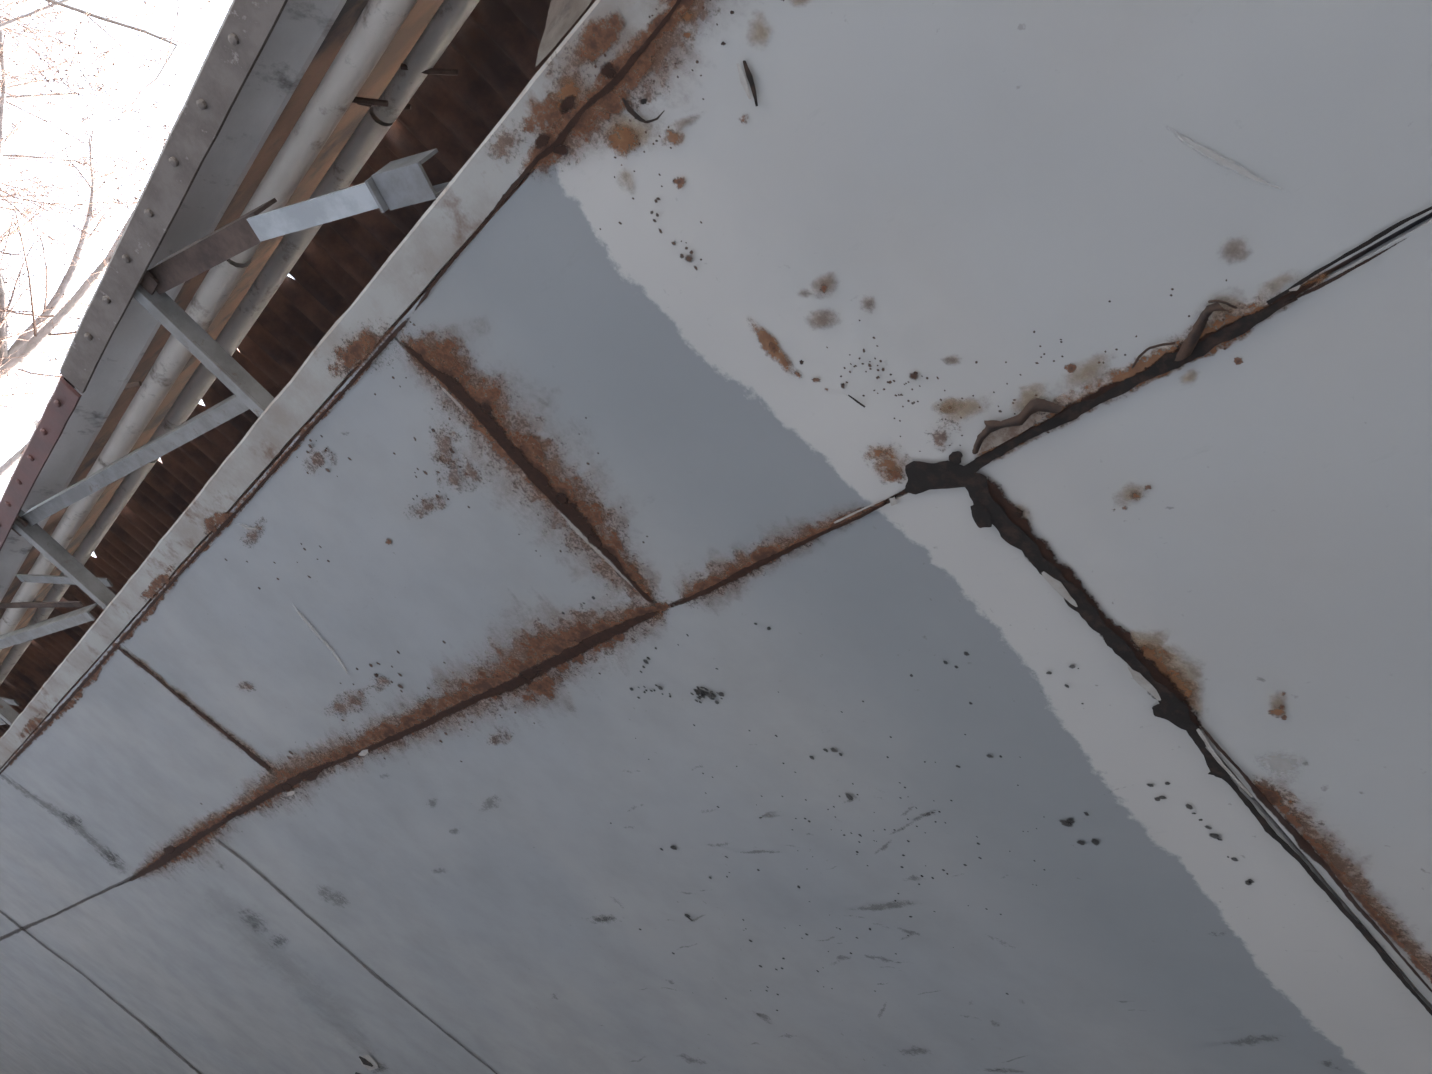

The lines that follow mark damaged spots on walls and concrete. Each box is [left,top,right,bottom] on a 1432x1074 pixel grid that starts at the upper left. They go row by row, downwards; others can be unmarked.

rust [0,0,981,881]
rust [976,273,1327,460]
rust [1131,636,1198,709]
crack [947,206,1432,1015]
rust [1253,779,1432,984]